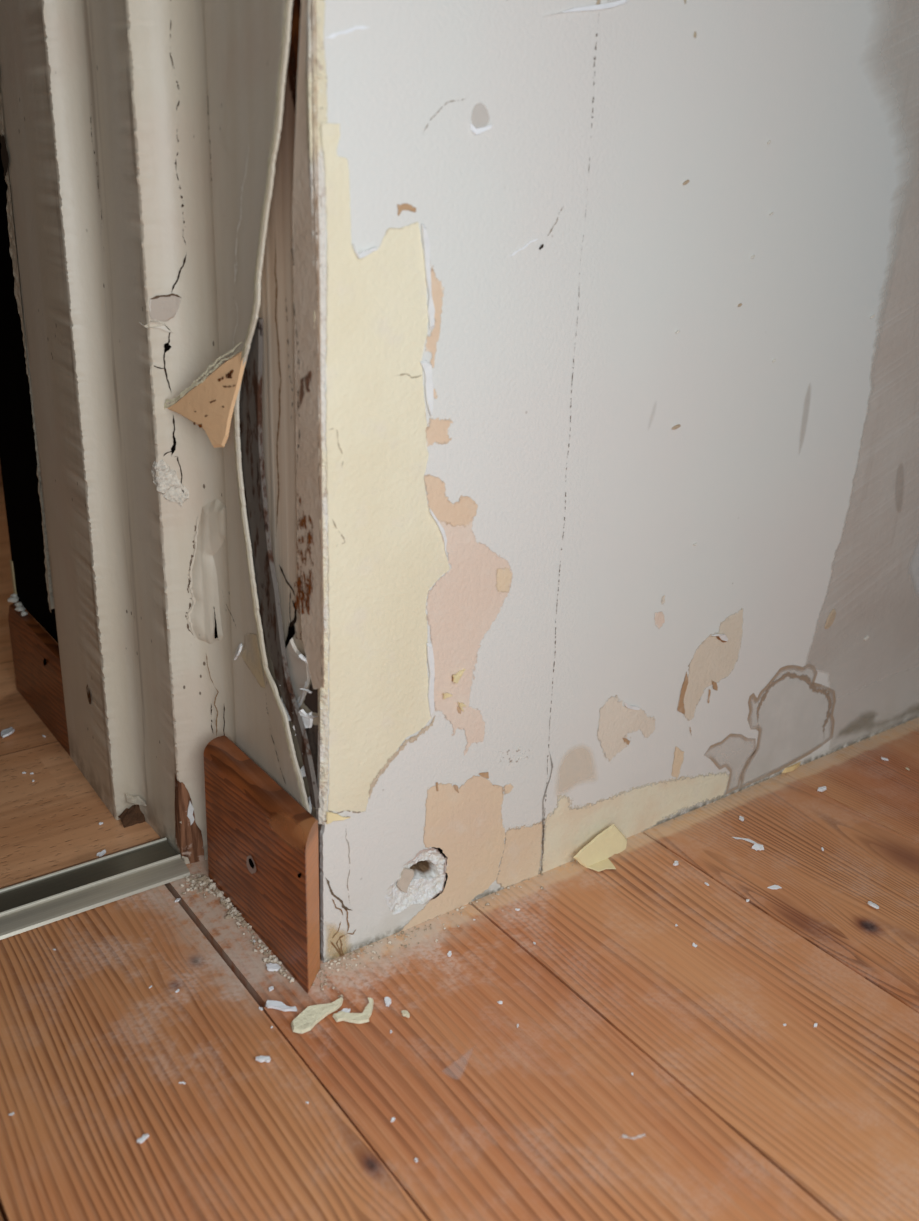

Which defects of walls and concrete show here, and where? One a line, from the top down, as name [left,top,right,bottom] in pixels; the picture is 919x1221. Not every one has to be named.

crack [154,325,184,493]
peeling [279,0,513,825]
peeling [597,695,656,761]
peeling [677,609,743,735]
leakage [704,664,873,794]